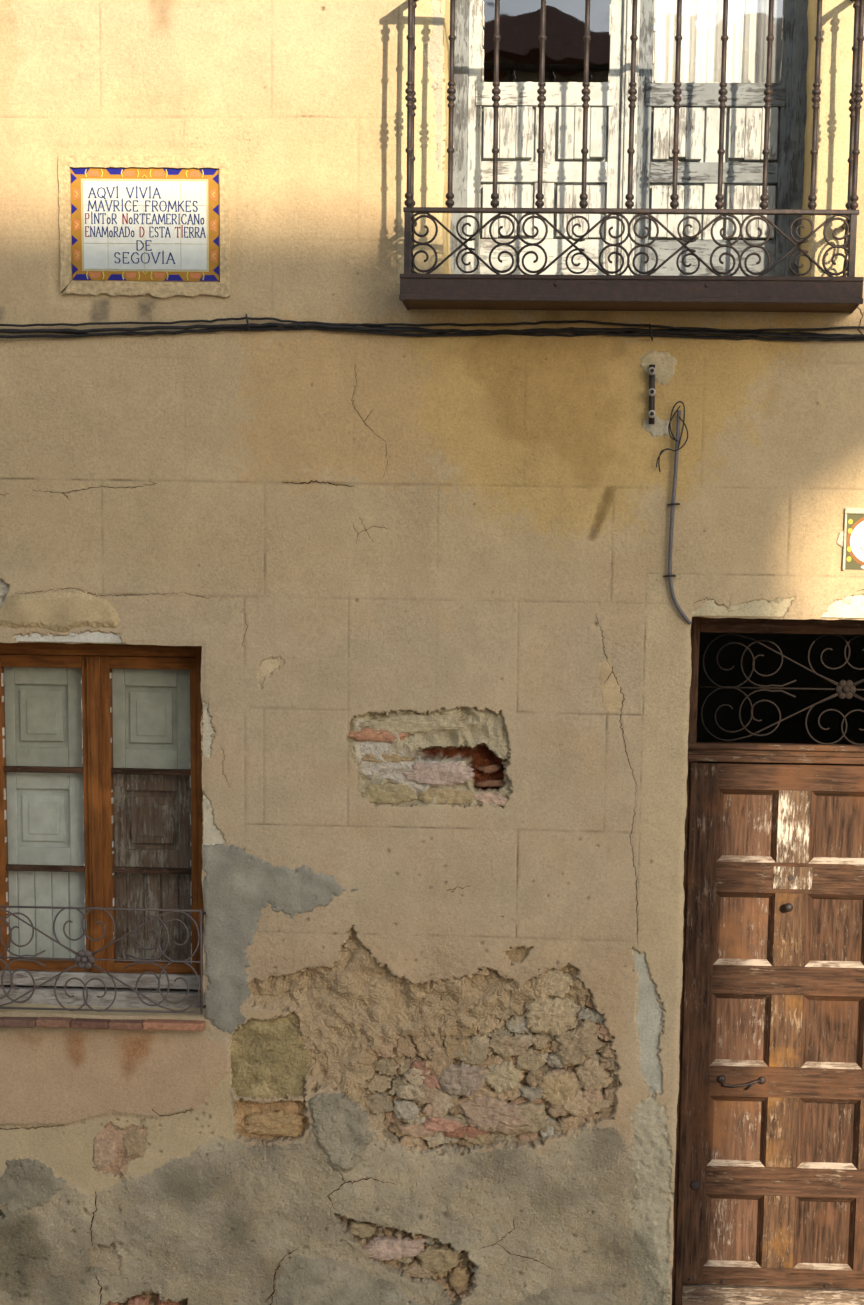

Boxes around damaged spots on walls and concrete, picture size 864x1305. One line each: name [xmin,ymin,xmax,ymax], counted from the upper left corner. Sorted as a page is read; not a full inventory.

crack [352,363,388,474]
crack [282,479,352,487]
peeling [692,597,795,617]
peeling [822,594,864,618]
spalling [347,708,512,807]
spalling [230,928,620,1154]
peeling [633,950,663,1095]
spalling [93,1122,148,1178]
spalling [106,1290,187,1305]
spalling [339,1215,474,1303]